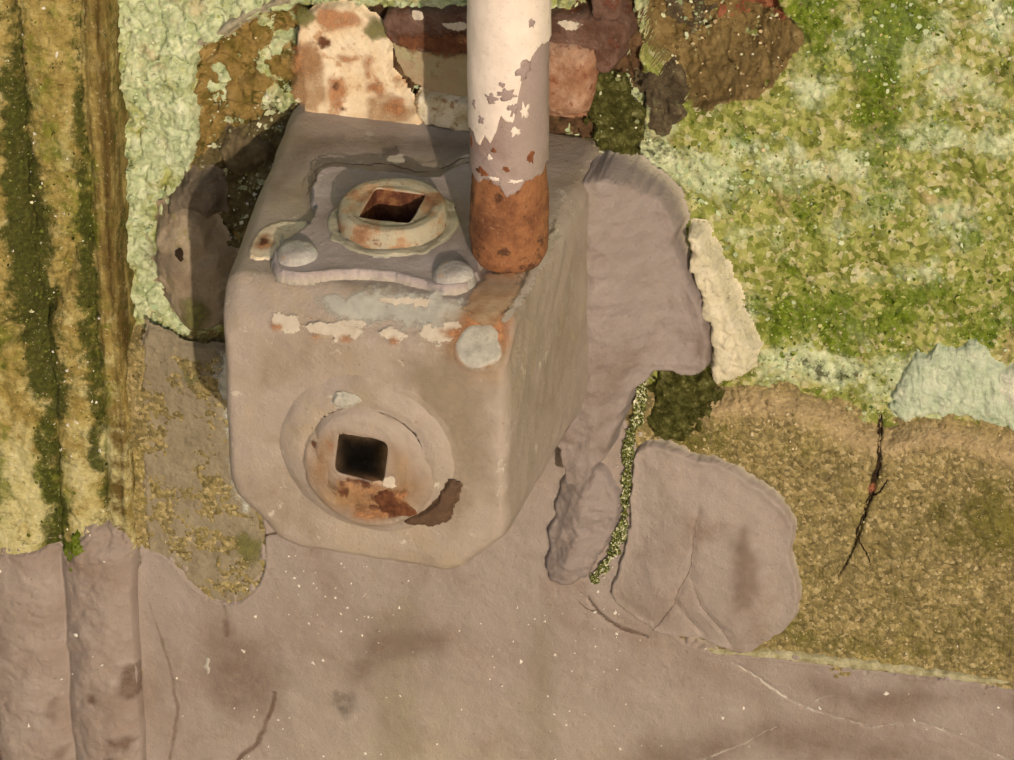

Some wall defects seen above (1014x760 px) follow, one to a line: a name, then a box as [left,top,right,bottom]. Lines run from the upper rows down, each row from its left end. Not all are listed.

rust [295,4,467,122]
rust [558,20,583,31]
rust [613,0,650,88]
flaking render [189,0,308,260]
rust [549,115,596,138]
peeling [271,291,468,347]
peeling [141,319,265,602]
rust [338,476,417,518]
crack [840,414,888,574]
crack [738,665,835,713]
crack [702,726,777,760]